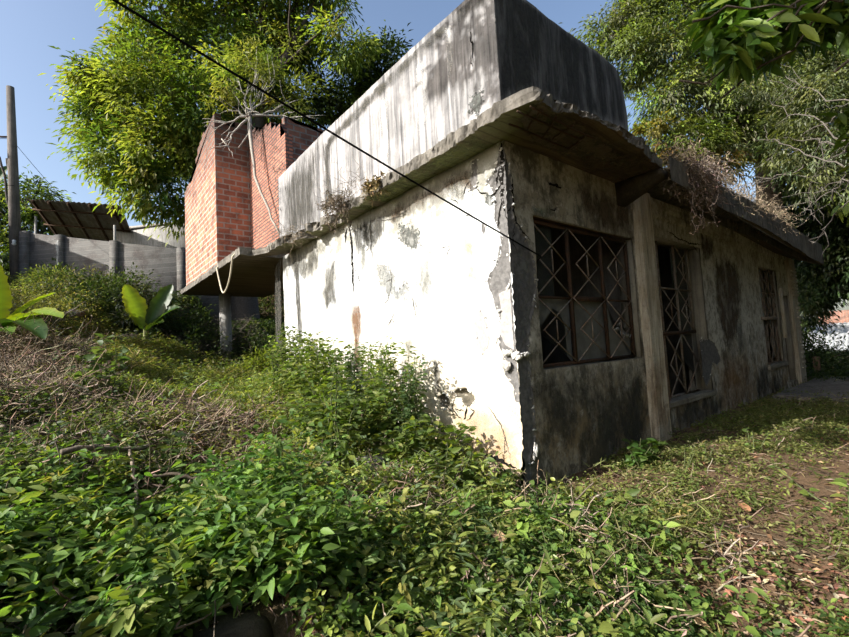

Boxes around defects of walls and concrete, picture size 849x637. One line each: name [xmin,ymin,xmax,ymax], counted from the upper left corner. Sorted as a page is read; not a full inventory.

damp [284,26,452,235]
damp [444,171,471,195]
damp [354,191,434,266]
damp [291,252,317,345]
damp [323,263,336,309]
corrosion [352,307,361,372]
flaking render [467,142,539,492]
damp [701,233,742,350]
spalling [438,387,475,420]
damp [534,378,643,448]